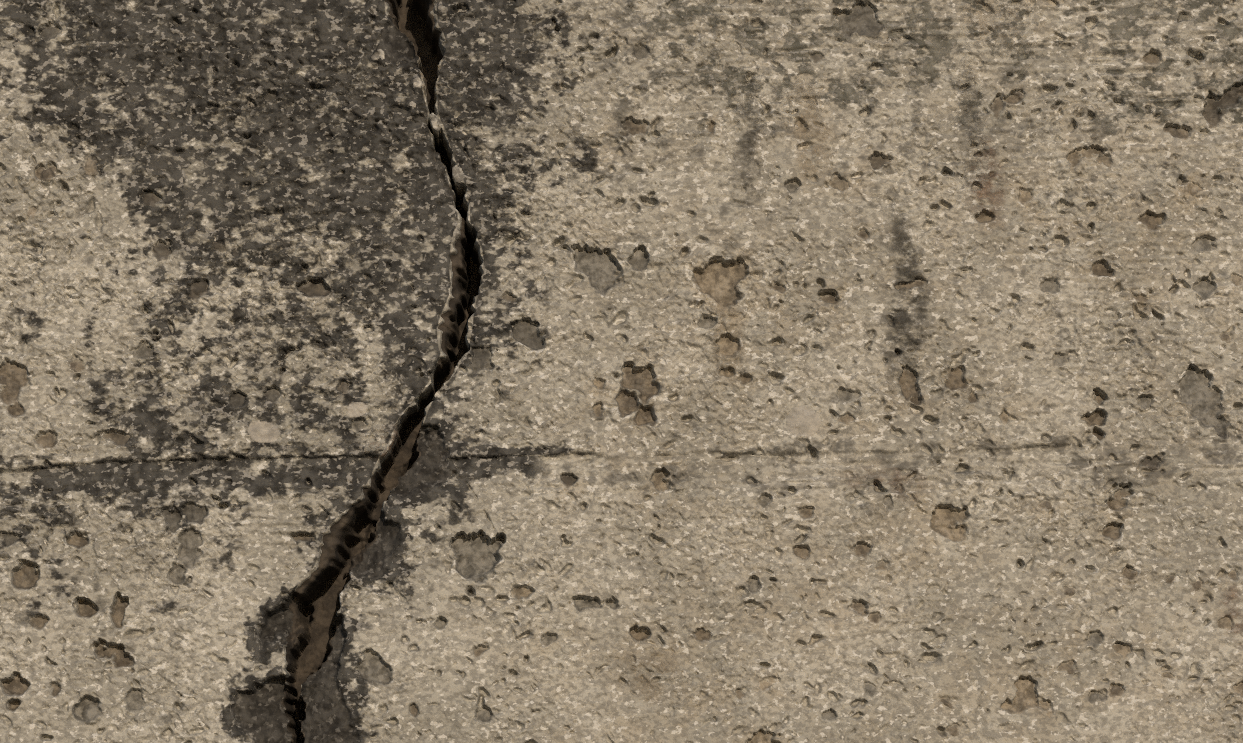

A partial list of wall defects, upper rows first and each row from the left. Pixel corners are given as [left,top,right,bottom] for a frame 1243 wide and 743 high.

crack [0,467,34,475]
water stain [0,0,595,743]
crack [231,0,481,743]